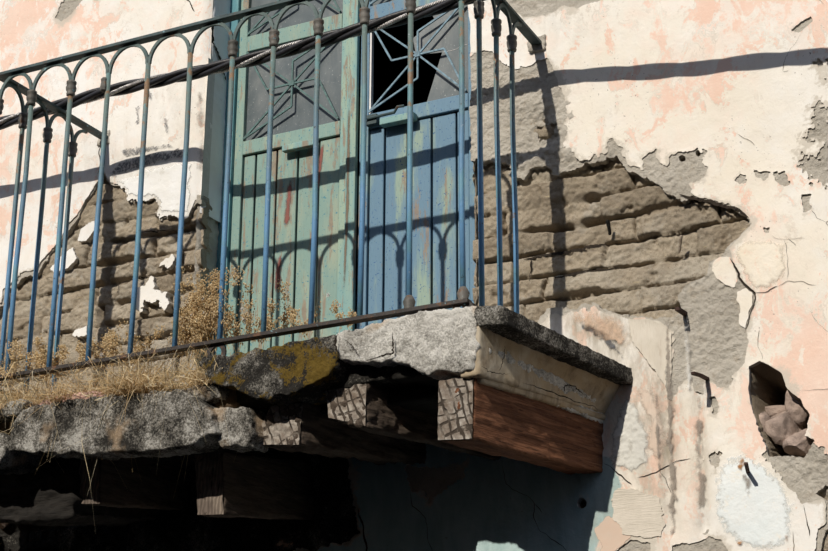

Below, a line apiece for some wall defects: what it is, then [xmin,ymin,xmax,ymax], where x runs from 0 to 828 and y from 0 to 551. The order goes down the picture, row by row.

flaking render [56,0,82,21]
flaking render [506,0,600,17]
flaking render [792,17,813,33]
flaking render [0,172,219,400]
flaking render [469,51,828,551]
crack [730,237,811,359]
flaking render [0,455,361,551]